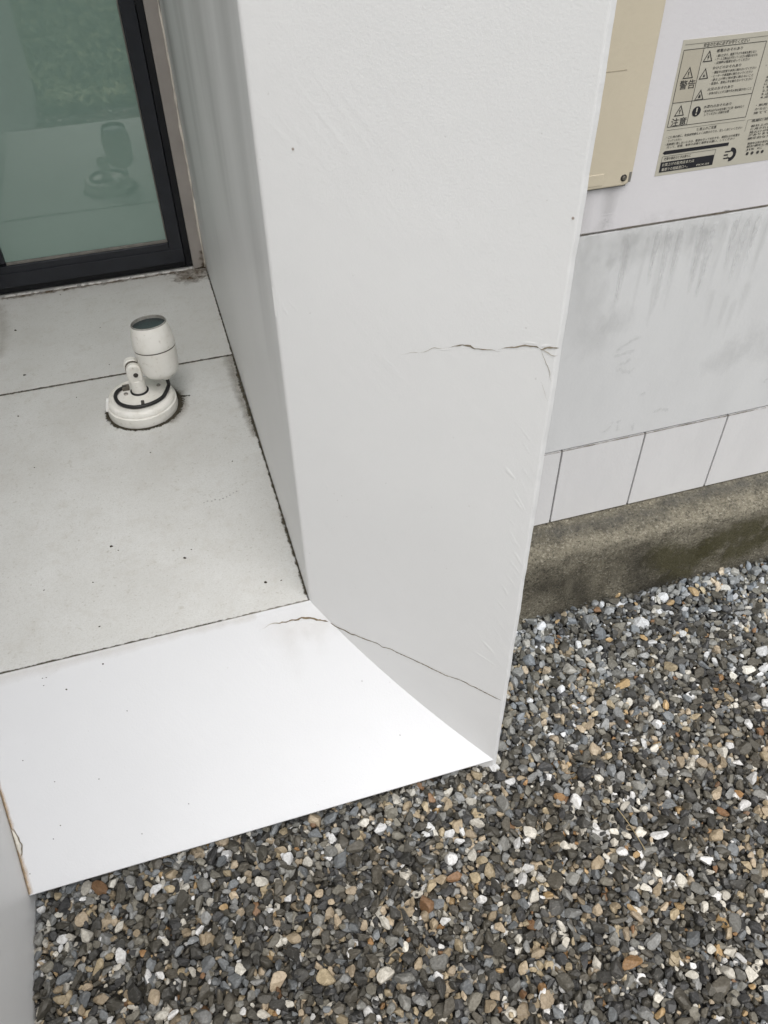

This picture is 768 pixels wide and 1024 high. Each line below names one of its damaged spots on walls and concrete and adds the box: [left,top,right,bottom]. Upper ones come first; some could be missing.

damp [581,205,768,236]
crack [407,341,557,397]
damp [544,407,765,456]
crack [266,617,500,700]